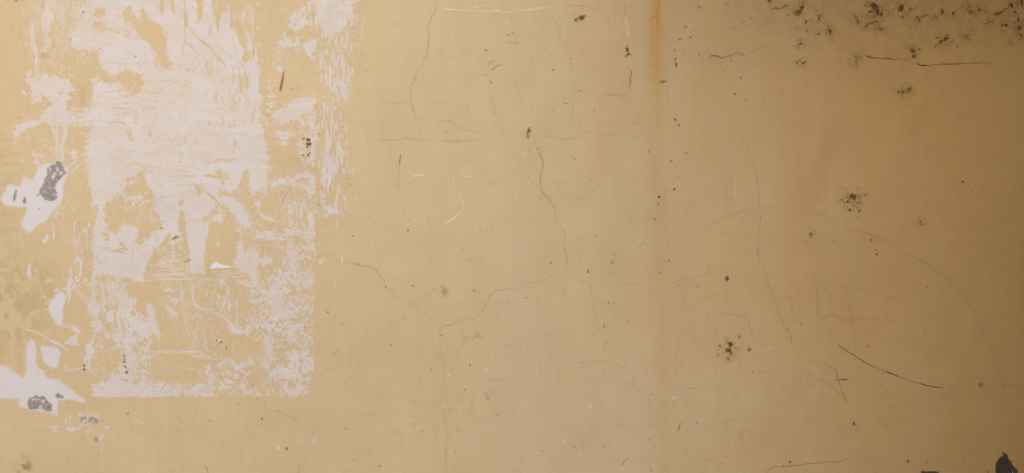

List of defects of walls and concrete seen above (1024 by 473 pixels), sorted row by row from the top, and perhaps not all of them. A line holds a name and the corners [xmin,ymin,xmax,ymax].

crack [709,43,776,62]
mould [767,0,839,69]
crack [863,54,993,66]
mould [850,0,1024,63]
peeling [0,0,370,471]
crack [316,0,655,473]